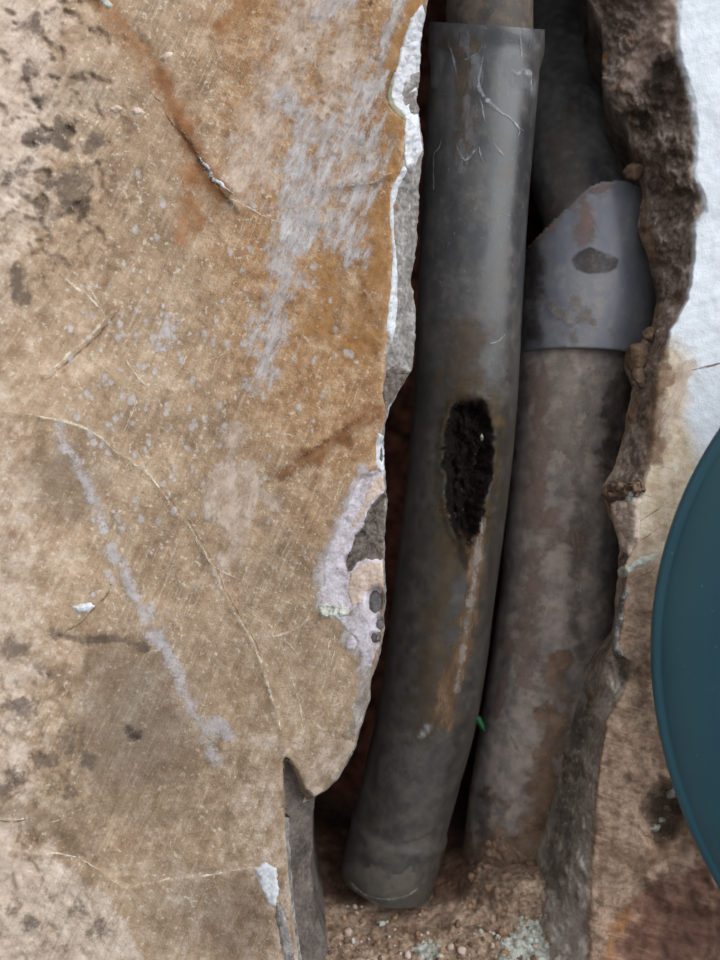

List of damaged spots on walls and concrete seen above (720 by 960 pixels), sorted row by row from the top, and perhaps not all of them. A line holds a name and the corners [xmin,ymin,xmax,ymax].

leakage [376,0,406,64]
rust [385,27,406,72]
rust [404,0,424,17]
rust [153,61,228,245]
leakage [241,28,393,398]
spalling [386,5,425,342]
leakage [51,443,234,761]
crack [7,275,317,773]
rust [280,402,385,479]
spalling [382,364,409,410]
spalling [601,478,646,556]
peeling [254,433,386,960]